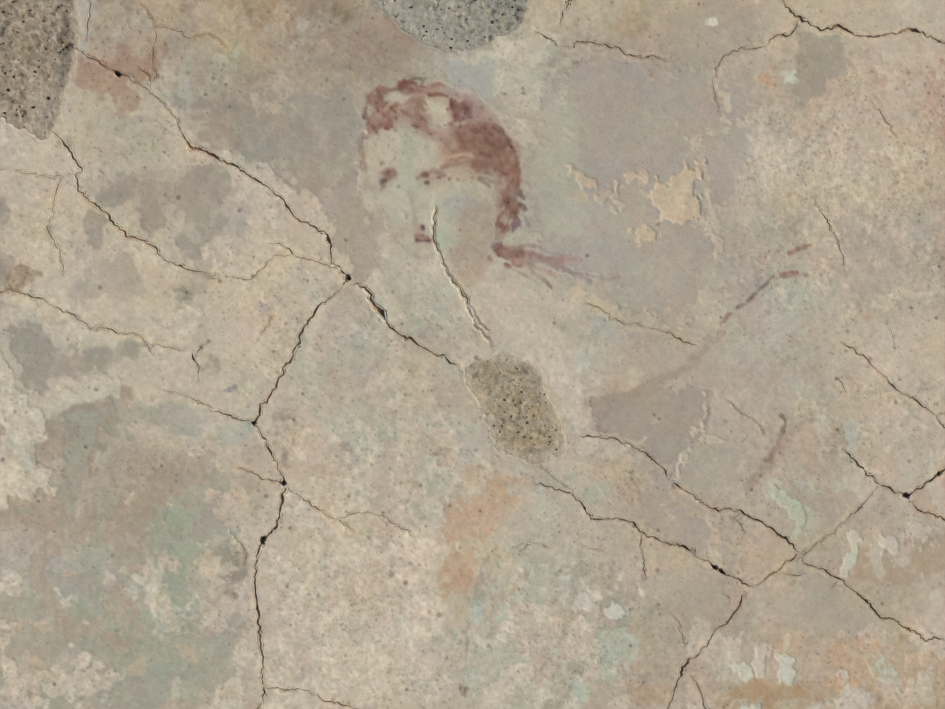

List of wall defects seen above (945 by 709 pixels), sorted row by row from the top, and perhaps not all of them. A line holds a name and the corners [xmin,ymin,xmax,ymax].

spalling [0,0,83,147]
spalling [368,0,534,59]
crack [534,0,667,62]
crack [710,0,945,113]
crack [869,100,898,138]
crack [0,0,463,709]
crack [431,204,495,354]
spalling [460,349,570,468]
crack [587,302,697,347]
crack [810,195,846,271]
crack [839,341,945,430]
crack [535,433,945,709]